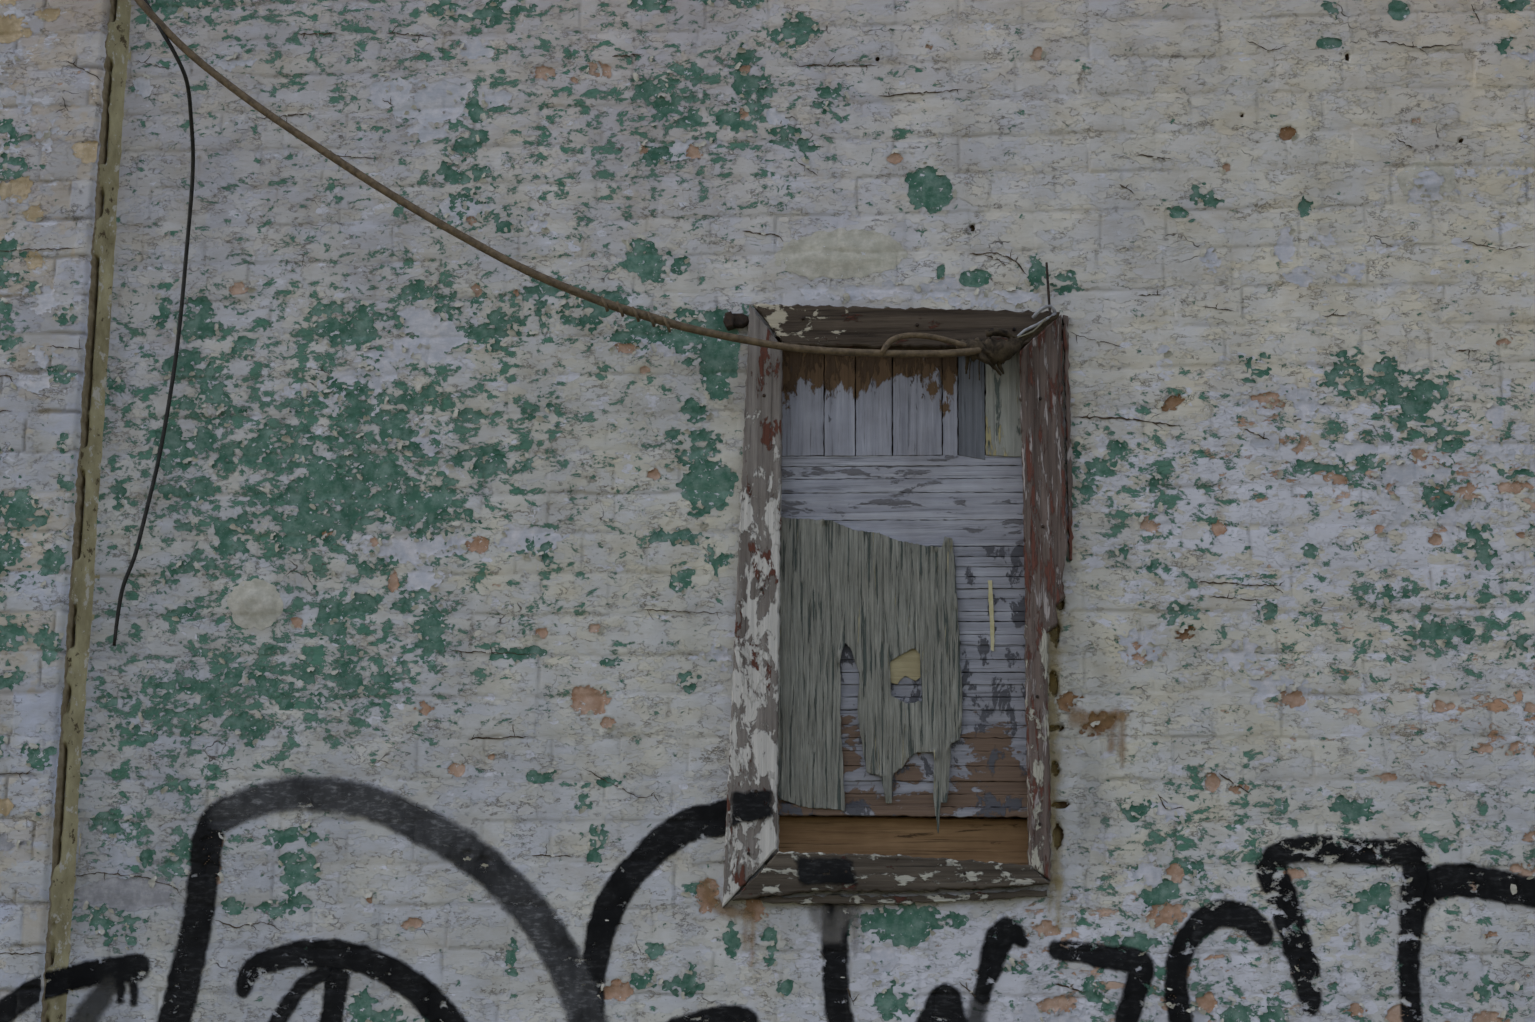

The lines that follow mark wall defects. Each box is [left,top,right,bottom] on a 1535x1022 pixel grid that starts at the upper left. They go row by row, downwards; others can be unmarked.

peeling [359,73,550,239]
peeling [630,12,821,167]
peeling [0,236,78,394]
peeling [618,234,691,283]
peeling [0,433,78,691]
peeling [84,278,740,748]
peeling [1235,350,1535,571]
peeling [136,821,329,921]
peeling [574,775,626,868]
peeling [597,942,705,1001]
spalling [680,877,794,997]
peeling [1094,853,1206,956]